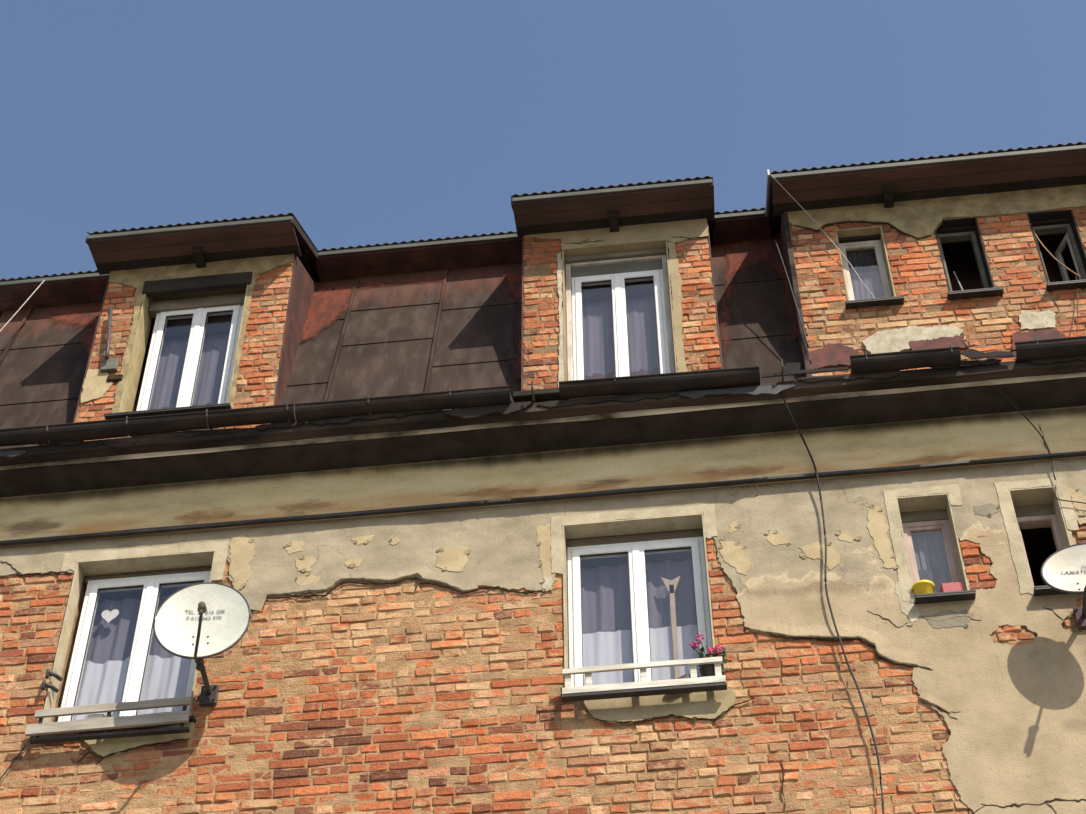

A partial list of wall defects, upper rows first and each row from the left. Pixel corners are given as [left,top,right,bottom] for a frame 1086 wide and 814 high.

corrosion [51,305,101,353]
corrosion [299,277,444,342]
corrosion [724,231,798,337]
spalling [953,530,996,590]
spalling [0,505,975,814]
spalling [991,625,1035,646]
spalling [1063,594,1086,633]
crack [973,798,1086,814]